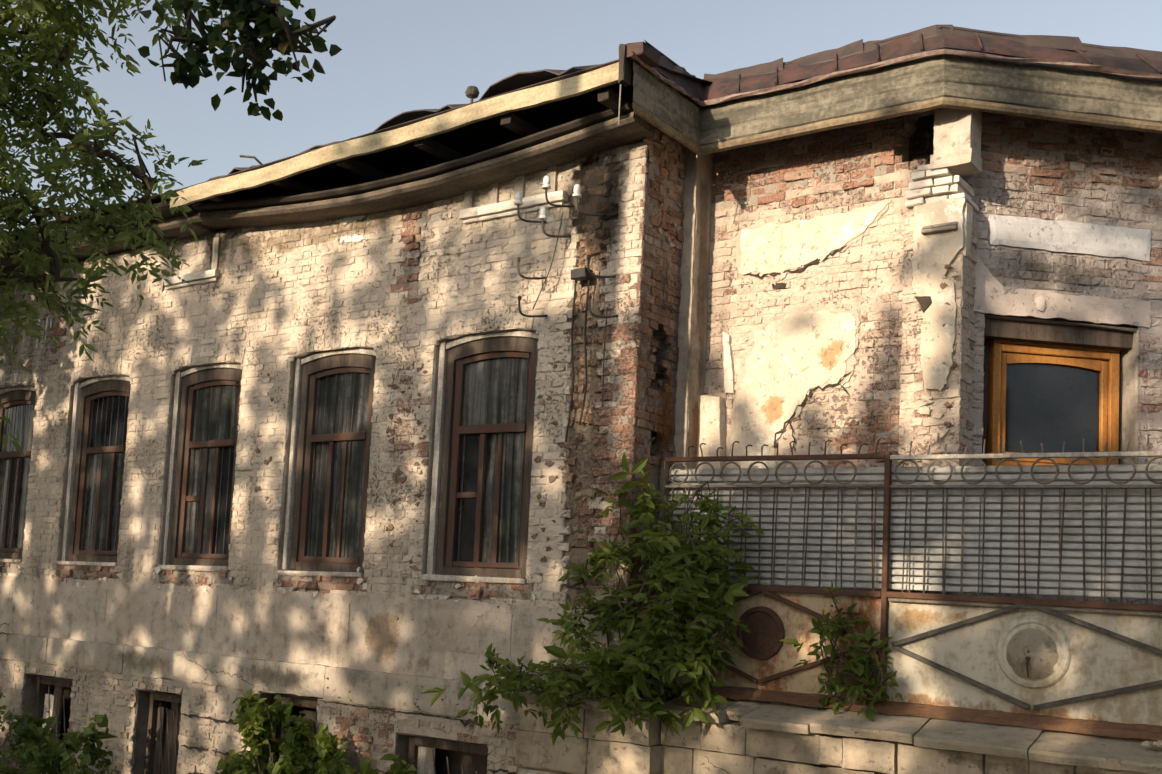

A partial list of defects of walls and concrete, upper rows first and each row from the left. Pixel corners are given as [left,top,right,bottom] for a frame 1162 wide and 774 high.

spalling [713,114,935,289]
spalling [981,112,1162,190]
spalling [390,202,435,304]
spalling [41,302,67,354]
peeling [912,198,973,441]
peeling [696,307,861,475]
crack [769,370,853,454]
spalling [821,405,900,468]